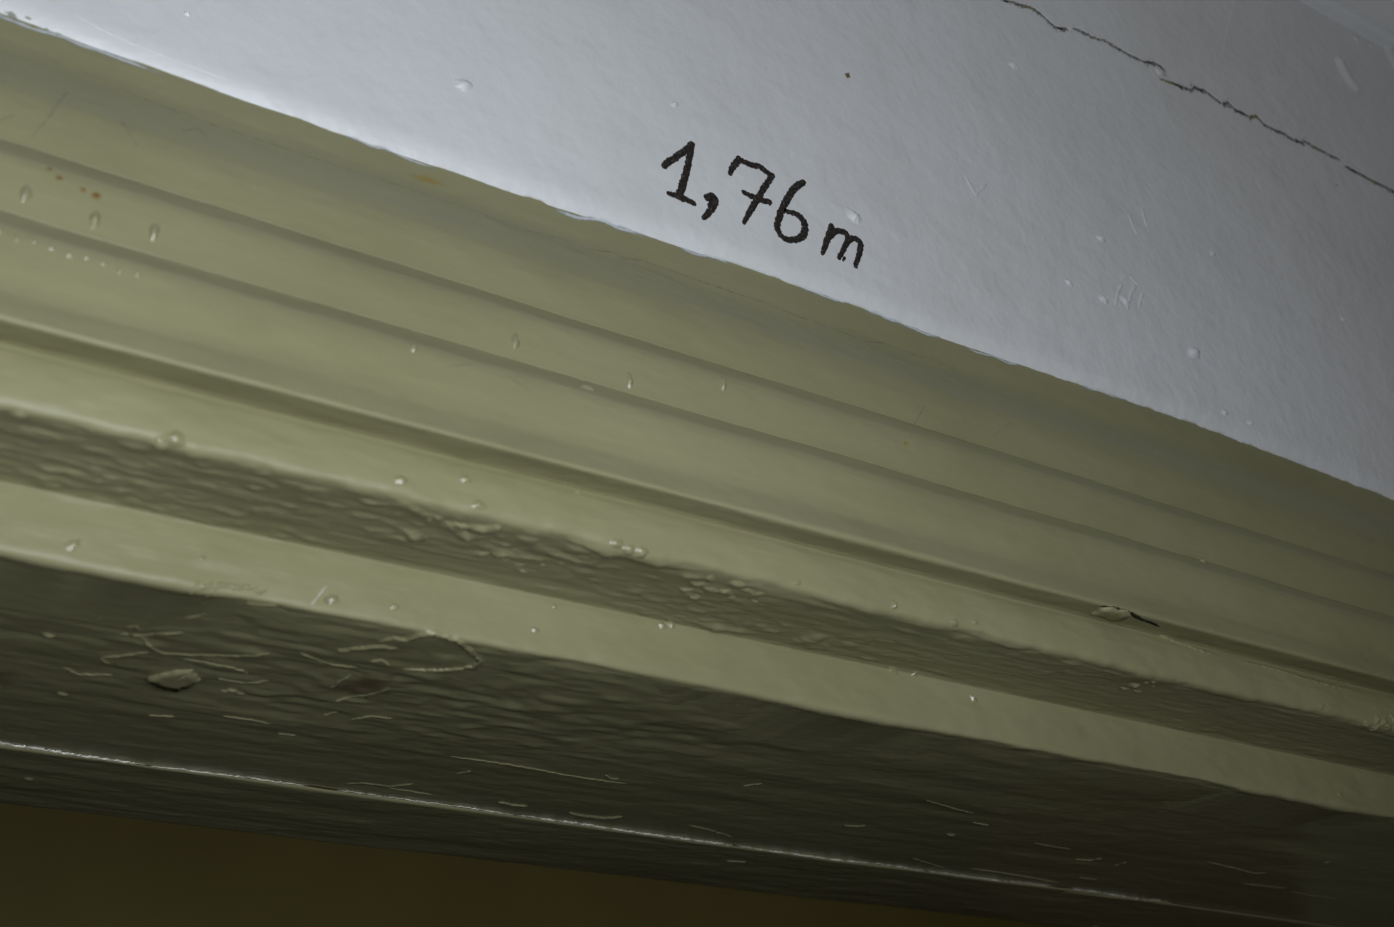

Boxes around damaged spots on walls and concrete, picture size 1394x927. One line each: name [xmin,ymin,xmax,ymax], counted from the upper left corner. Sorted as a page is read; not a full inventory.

crack [1001,0,1394,193]
peeling [63,581,277,695]
peeling [300,629,484,720]